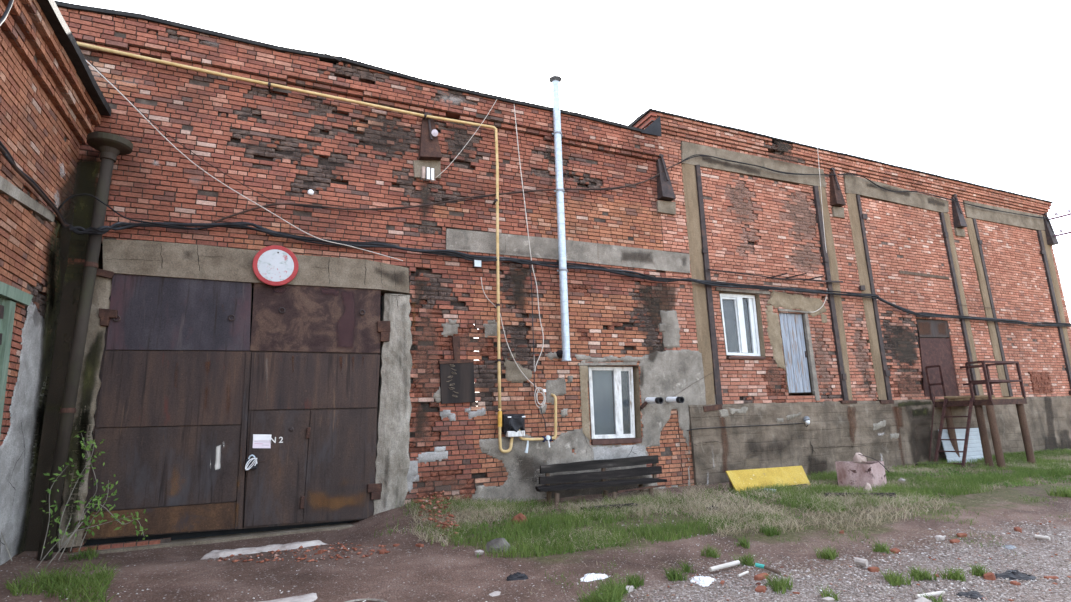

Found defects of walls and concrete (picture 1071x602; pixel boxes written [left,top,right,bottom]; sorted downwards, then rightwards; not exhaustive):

spalling [248,87,288,100]
spalling [318,62,389,85]
spalling [219,98,471,206]
water stain [25,153,97,553]
peeling [407,263,753,503]
peeling [750,287,841,403]
water stain [809,457,827,474]
water stain [908,410,933,463]